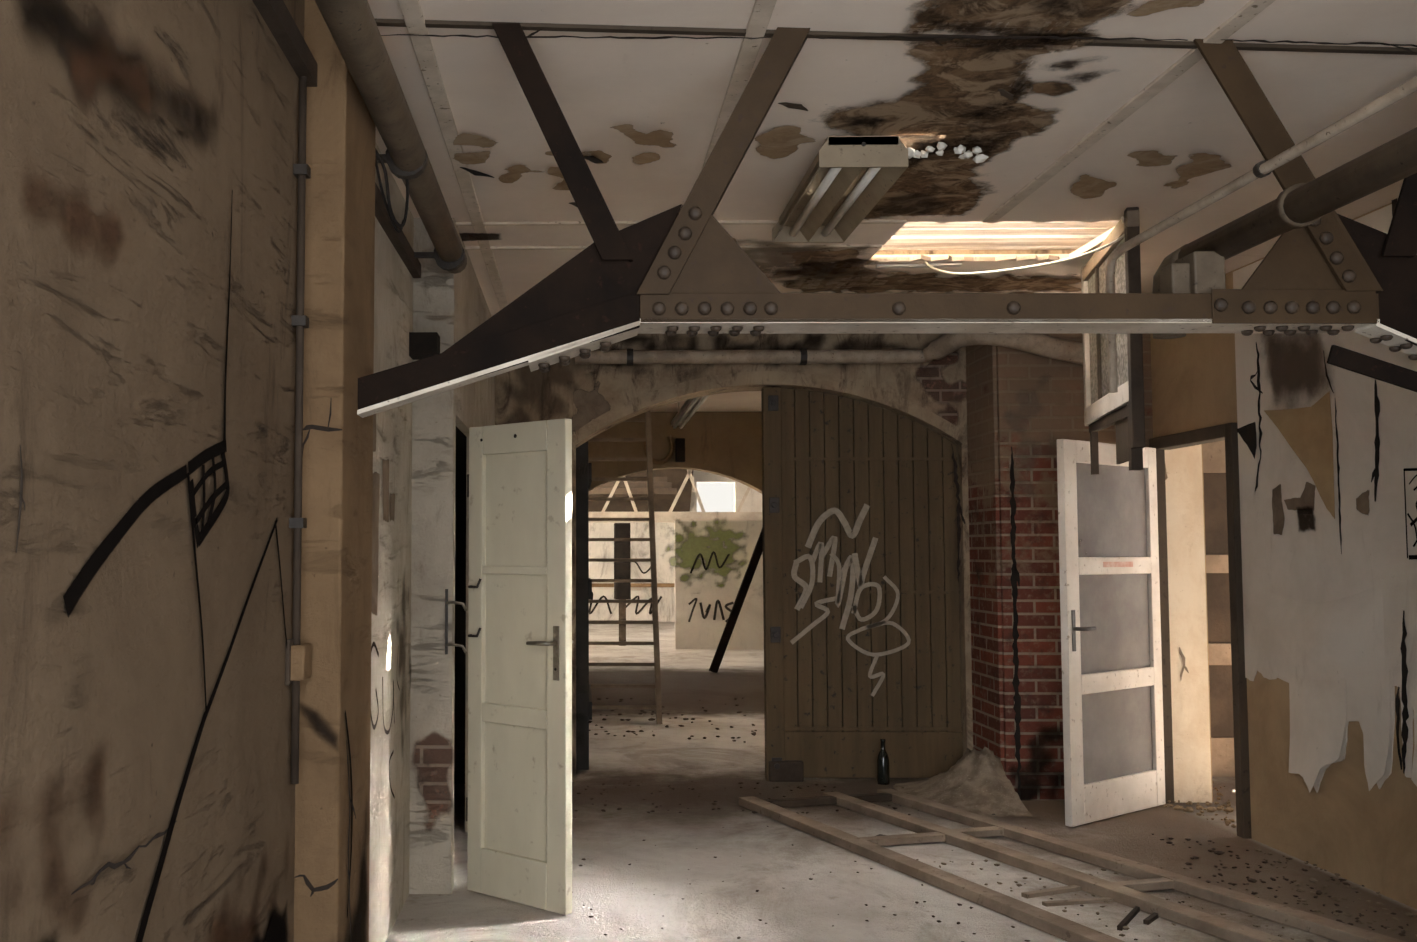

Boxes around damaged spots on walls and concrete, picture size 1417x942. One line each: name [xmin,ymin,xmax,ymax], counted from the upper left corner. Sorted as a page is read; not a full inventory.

peeling [1127,0,1204,17]
damp [824,0,1132,220]
peeling [453,133,578,208]
peeling [582,150,612,164]
peeling [610,123,676,165]
peeling [1070,174,1117,199]
peeling [1127,150,1232,189]
damp [744,242,1081,293]
spalling [795,249,1060,266]
peeling [1272,482,1316,535]
spalling [412,733,454,830]